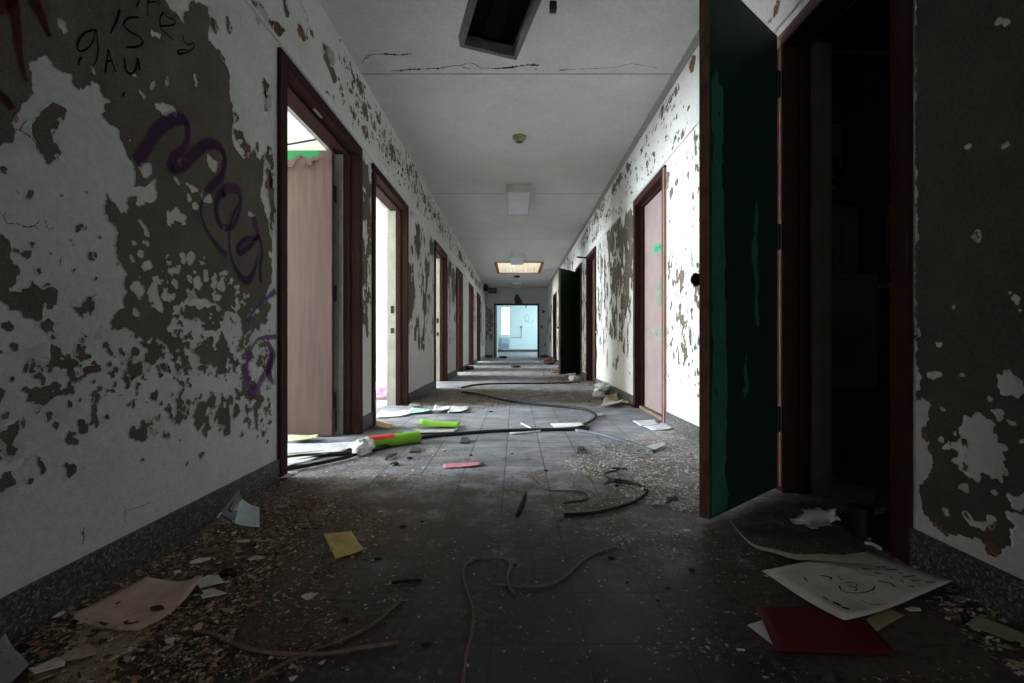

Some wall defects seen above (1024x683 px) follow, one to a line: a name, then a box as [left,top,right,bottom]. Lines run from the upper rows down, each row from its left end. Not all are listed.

peeling [0,0,277,493]
peeling [251,0,494,352]
crack [344,51,657,72]
peeling [563,83,699,398]
peeling [913,0,1024,557]